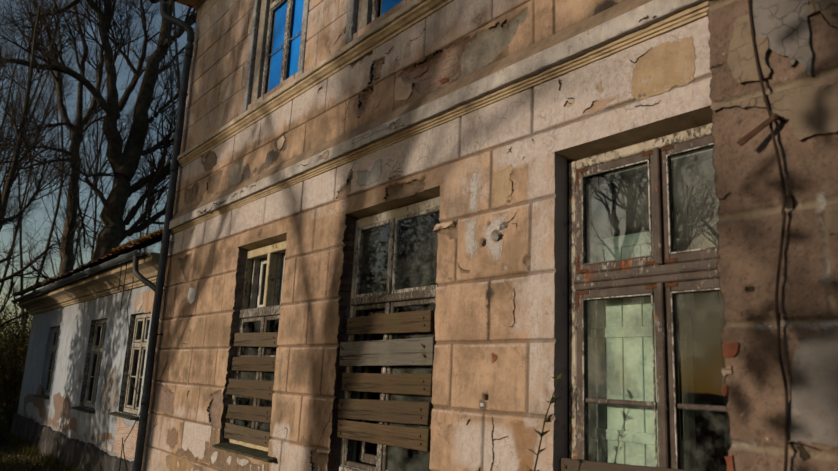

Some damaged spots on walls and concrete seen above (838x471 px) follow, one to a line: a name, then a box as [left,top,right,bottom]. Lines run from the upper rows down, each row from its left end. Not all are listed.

flaking render [350,53,385,118]
flaking render [394,38,471,104]
peeling [630,37,696,100]
peeling [710,0,838,142]
flaking render [274,132,287,151]
flaking render [184,151,248,214]
flaking render [384,171,426,202]
flaking render [24,385,138,459]
peeling [166,390,268,471]
flaking render [300,436,330,471]
crack [490,420,508,471]
peeling [788,327,838,461]